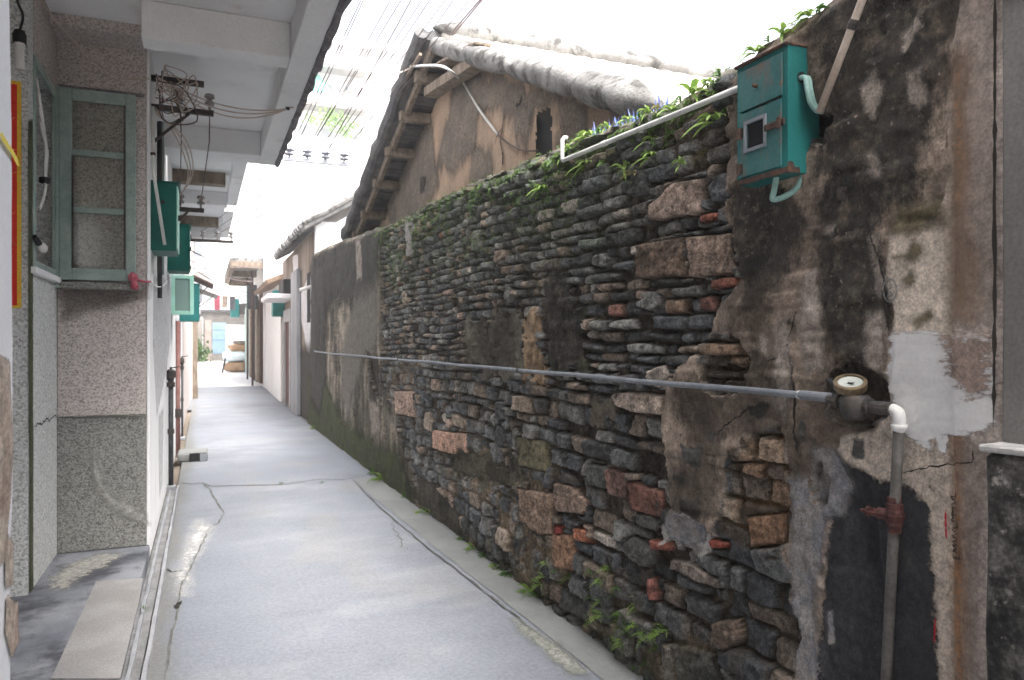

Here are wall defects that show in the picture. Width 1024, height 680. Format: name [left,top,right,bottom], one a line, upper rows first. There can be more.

water stain [723,0,965,387]
water stain [368,400,381,437]
peeling [694,267,1003,556]
crack [904,449,974,473]
crack [165,482,235,675]
crack [274,474,586,670]
water stain [788,447,939,680]